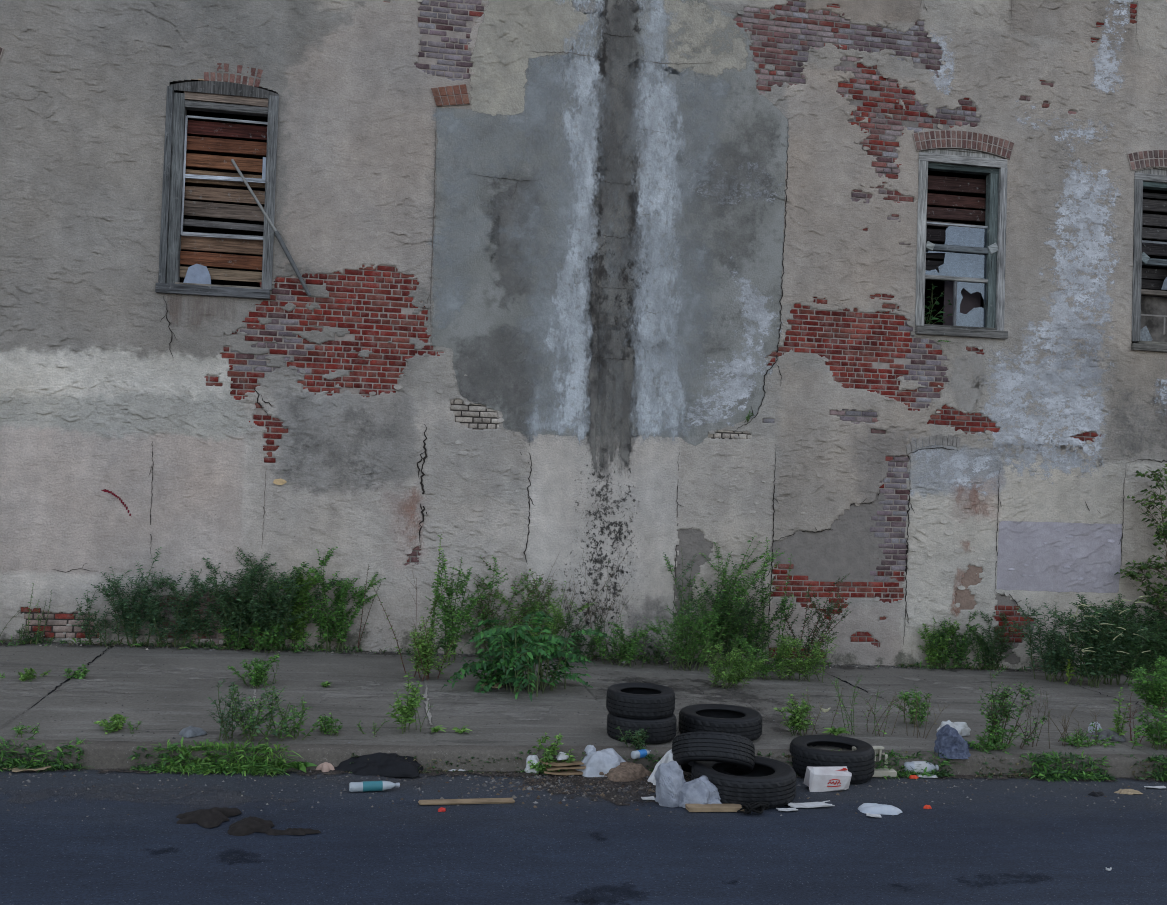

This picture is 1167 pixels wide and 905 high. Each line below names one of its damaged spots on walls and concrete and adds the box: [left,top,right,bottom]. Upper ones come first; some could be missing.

spalling [413,0,487,81]
spalling [733,0,981,222]
spalling [204,264,444,467]
damp [456,0,783,665]
spalling [765,294,1000,435]
damp [910,101,1121,495]
crack [417,424,428,548]
spalling [769,455,910,620]
spalling [20,607,99,640]
spalling [850,630,880,647]